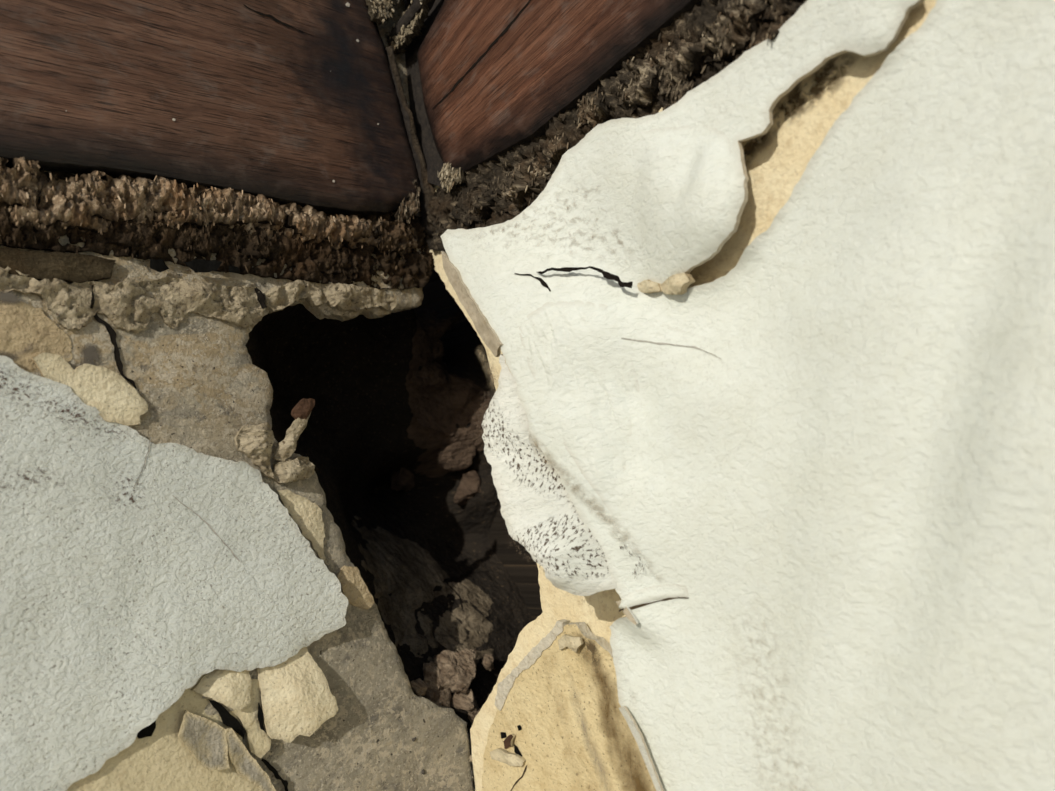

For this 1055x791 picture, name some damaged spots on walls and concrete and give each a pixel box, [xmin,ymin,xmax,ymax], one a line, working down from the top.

damp [744,61,848,165]
crack [515,266,633,291]
mould [474,391,568,498]
peeling [245,0,1055,791]
peeling [0,352,348,791]
mould [510,515,608,577]